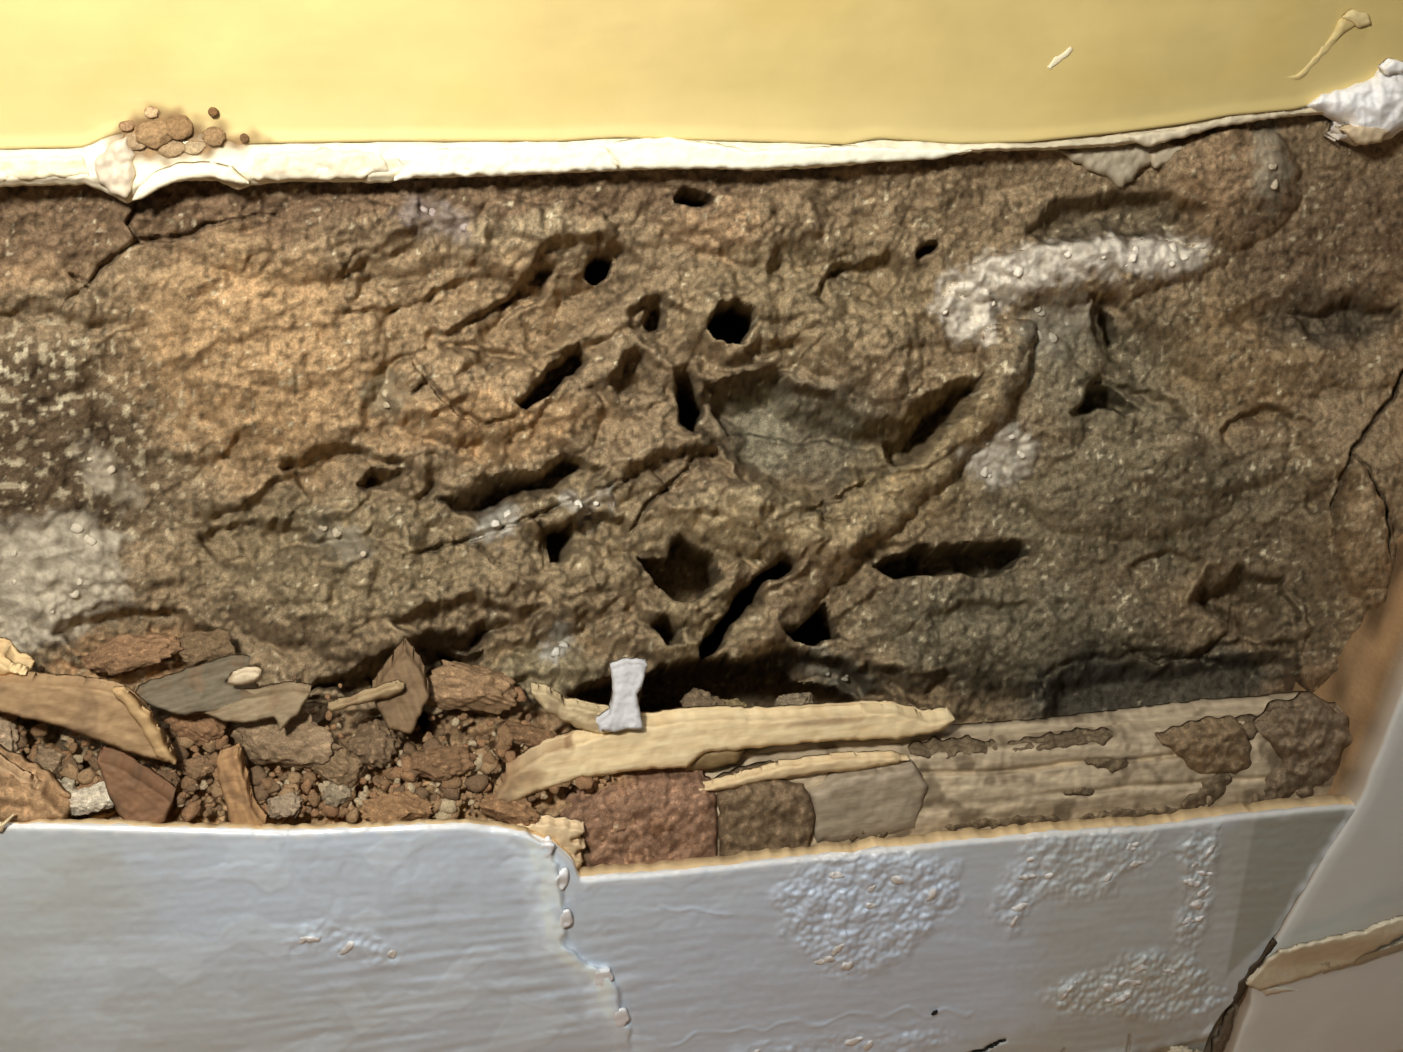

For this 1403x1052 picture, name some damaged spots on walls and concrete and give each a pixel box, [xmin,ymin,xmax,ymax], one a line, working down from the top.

flaking render [1335,124,1390,146]
flaking render [0,107,1324,203]
crack [60,201,281,310]
peeling [1169,241,1190,267]
peeling [1020,306,1070,343]
crack [1330,368,1403,559]
peeling [71,523,97,546]
peeling [319,525,342,538]
peeling [478,510,511,538]
peeling [551,641,568,657]
peeling [989,824,1231,1025]
peeling [1245,915,1403,996]